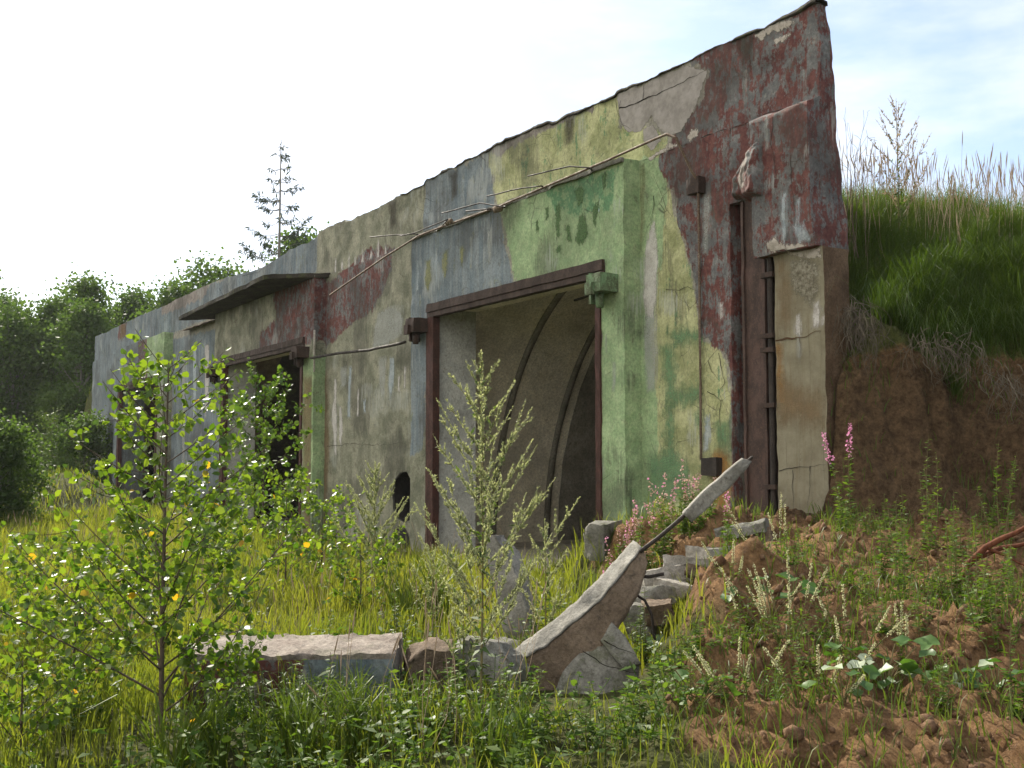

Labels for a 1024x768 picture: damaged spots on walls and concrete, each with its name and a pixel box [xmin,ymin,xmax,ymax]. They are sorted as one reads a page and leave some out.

crack [616,70,705,131]
peeling [617,65,707,160]
crack [775,331,815,353]